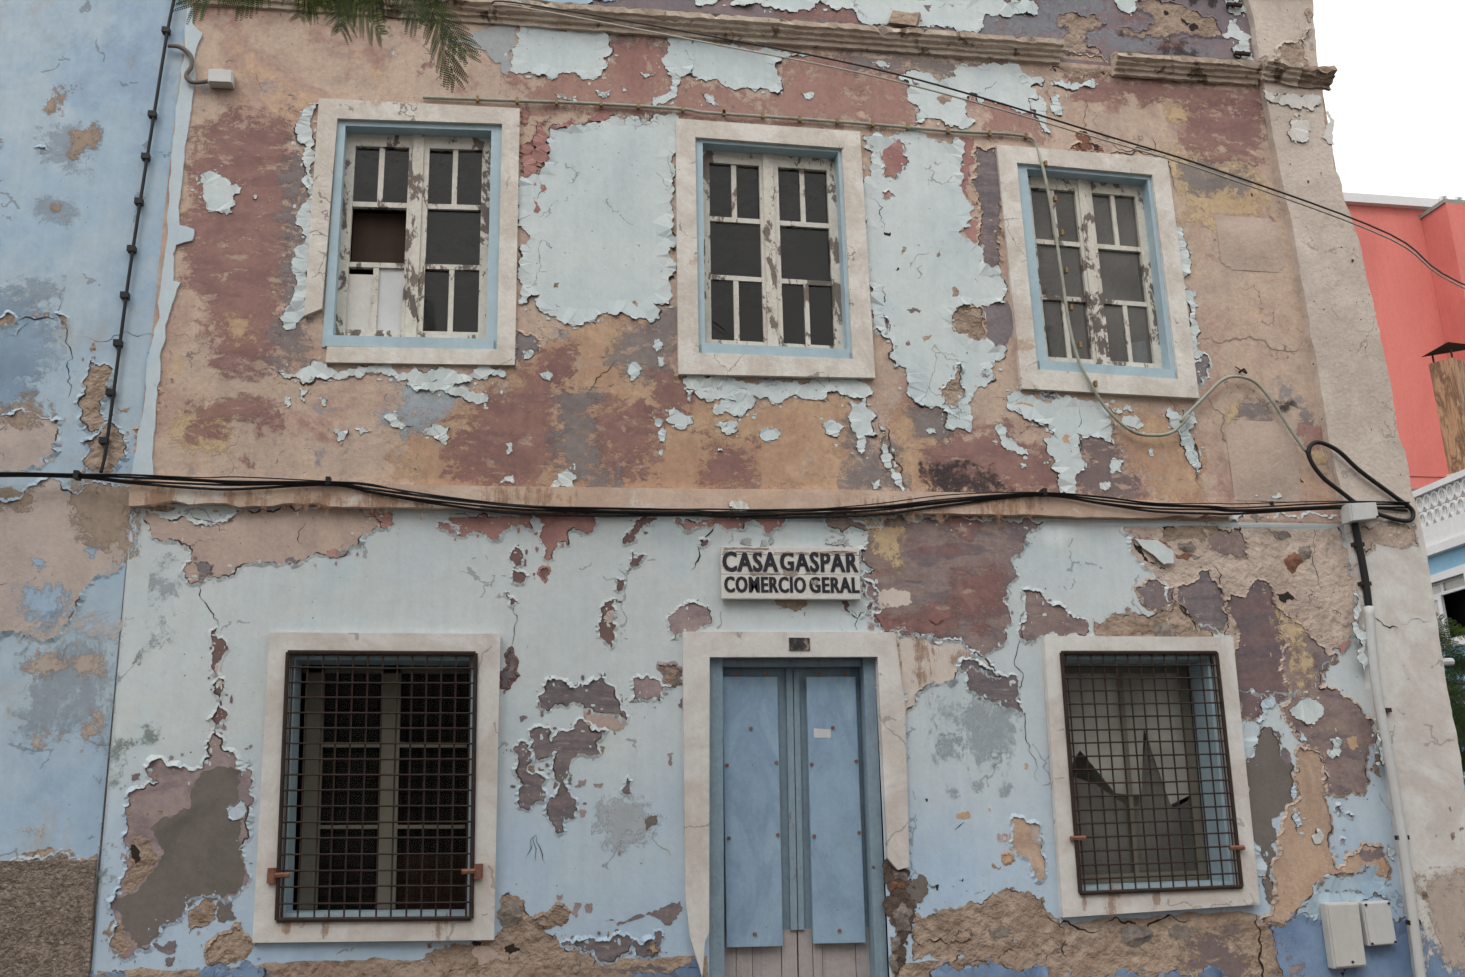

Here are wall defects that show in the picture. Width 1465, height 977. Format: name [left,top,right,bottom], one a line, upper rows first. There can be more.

spalling [1272,7,1314,66]
peeling [1286,111,1335,145]
spalling [0,309,71,338]
peeling [175,0,1269,651]
spalling [0,343,400,660]
peeling [1225,395,1328,465]
peeling [435,510,600,694]
spalling [9,824,97,861]
spalling [89,626,275,977]
spalling [416,883,703,977]
peeling [503,661,683,838]
spalling [822,501,1465,977]